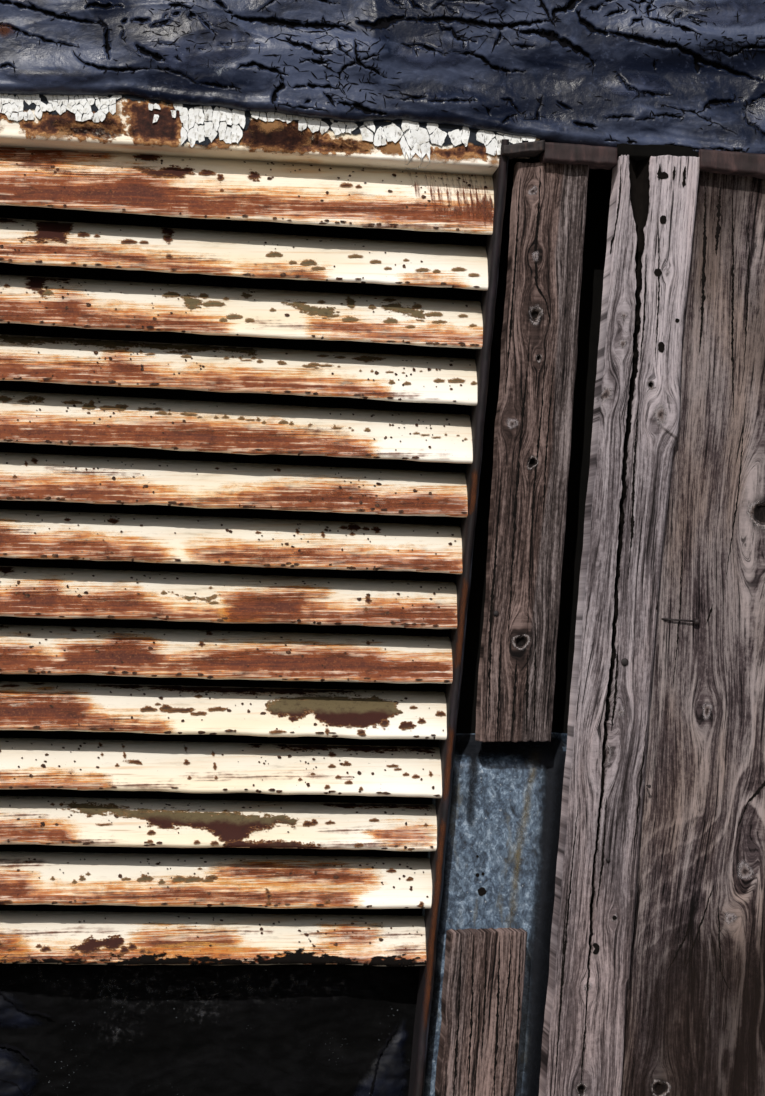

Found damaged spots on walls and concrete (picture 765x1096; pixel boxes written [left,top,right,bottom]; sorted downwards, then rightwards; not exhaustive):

peeling [0,94,122,122]
corrosion [0,99,499,232]
peeling [148,103,536,170]
crack [0,0,765,152]
peeling [368,298,447,328]
corrosion [0,410,424,458]
corrosion [0,469,477,516]
corrosion [0,519,467,683]
crack [579,134,650,1093]
peeling [97,684,446,790]
peeling [50,801,335,849]
corrosion [0,819,446,1023]